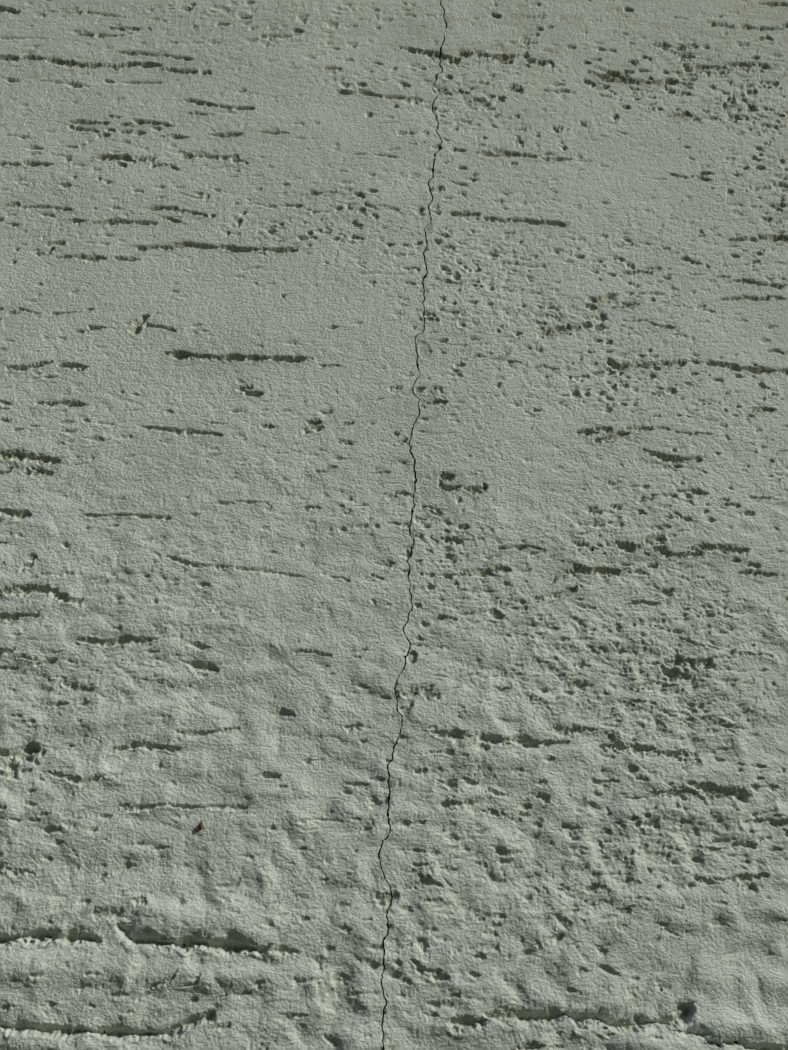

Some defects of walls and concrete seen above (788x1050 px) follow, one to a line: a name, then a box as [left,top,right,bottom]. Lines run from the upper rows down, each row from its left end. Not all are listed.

crack [378,0,447,1050]